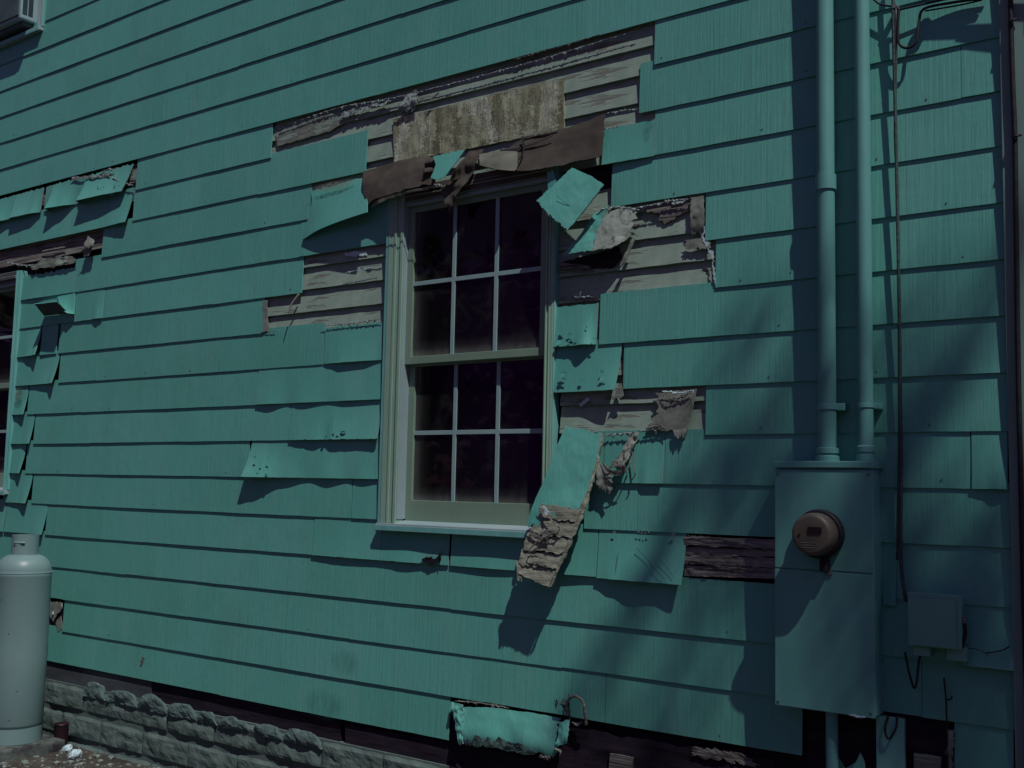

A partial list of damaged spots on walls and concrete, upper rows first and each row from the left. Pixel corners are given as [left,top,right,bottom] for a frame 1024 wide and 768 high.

peeling [272,21,655,202]
peeling [0,228,104,270]
peeling [262,244,386,333]
peeling [558,188,716,340]
peeling [559,343,706,439]